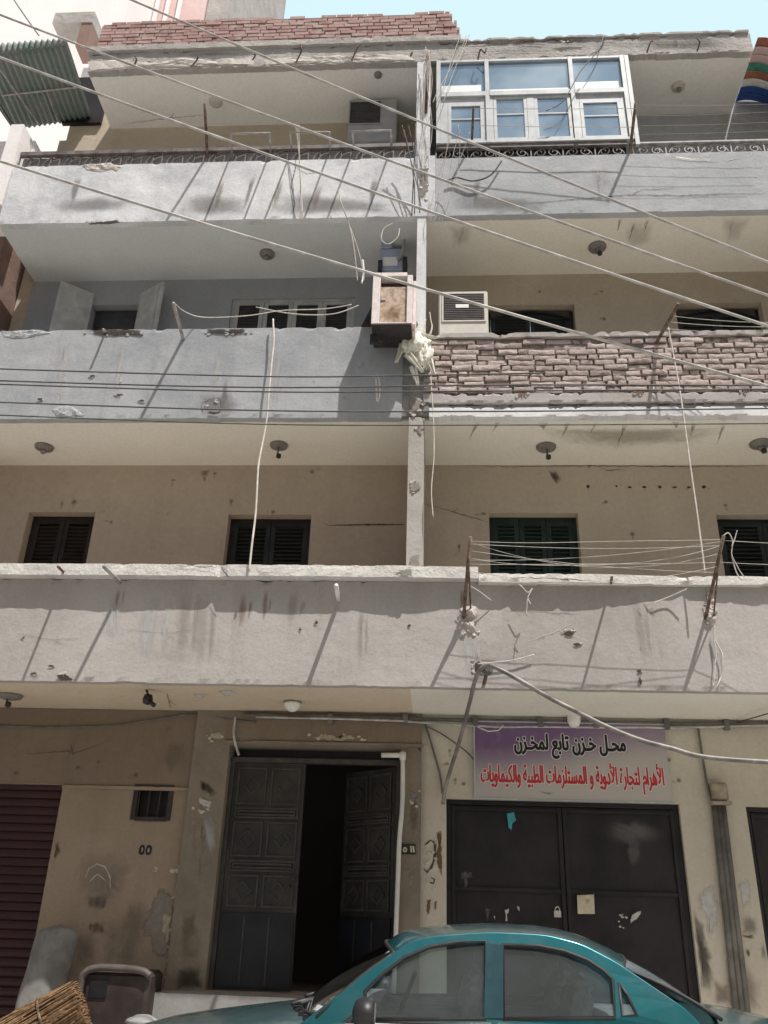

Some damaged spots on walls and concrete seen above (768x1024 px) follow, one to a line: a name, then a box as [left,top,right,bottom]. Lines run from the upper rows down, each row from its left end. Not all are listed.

spalling [88,42,414,70]
water stain [304,200,354,210]
spalling [1,330,50,339]
peeling [52,405,85,417]
crack [324,520,404,528]
spalling [192,797,212,814]